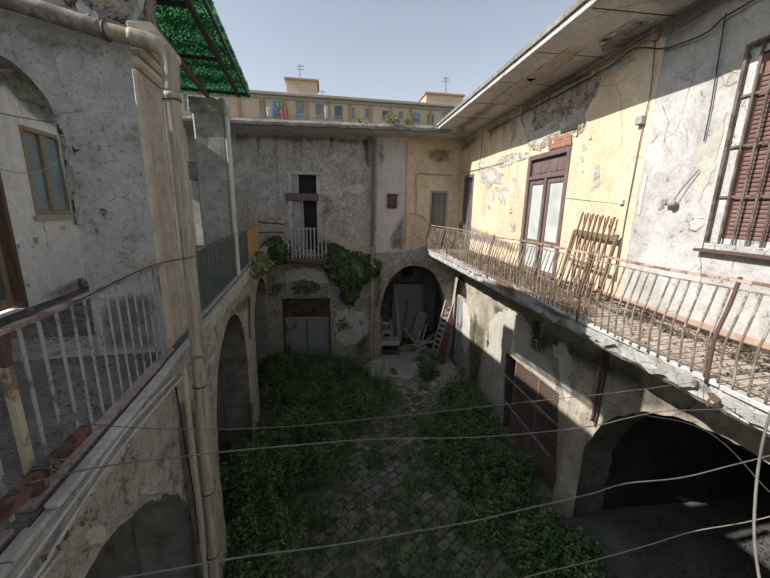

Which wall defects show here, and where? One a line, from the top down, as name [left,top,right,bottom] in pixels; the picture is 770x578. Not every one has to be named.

flaking render [61,0,157,28]
flaking render [476,17,661,213]